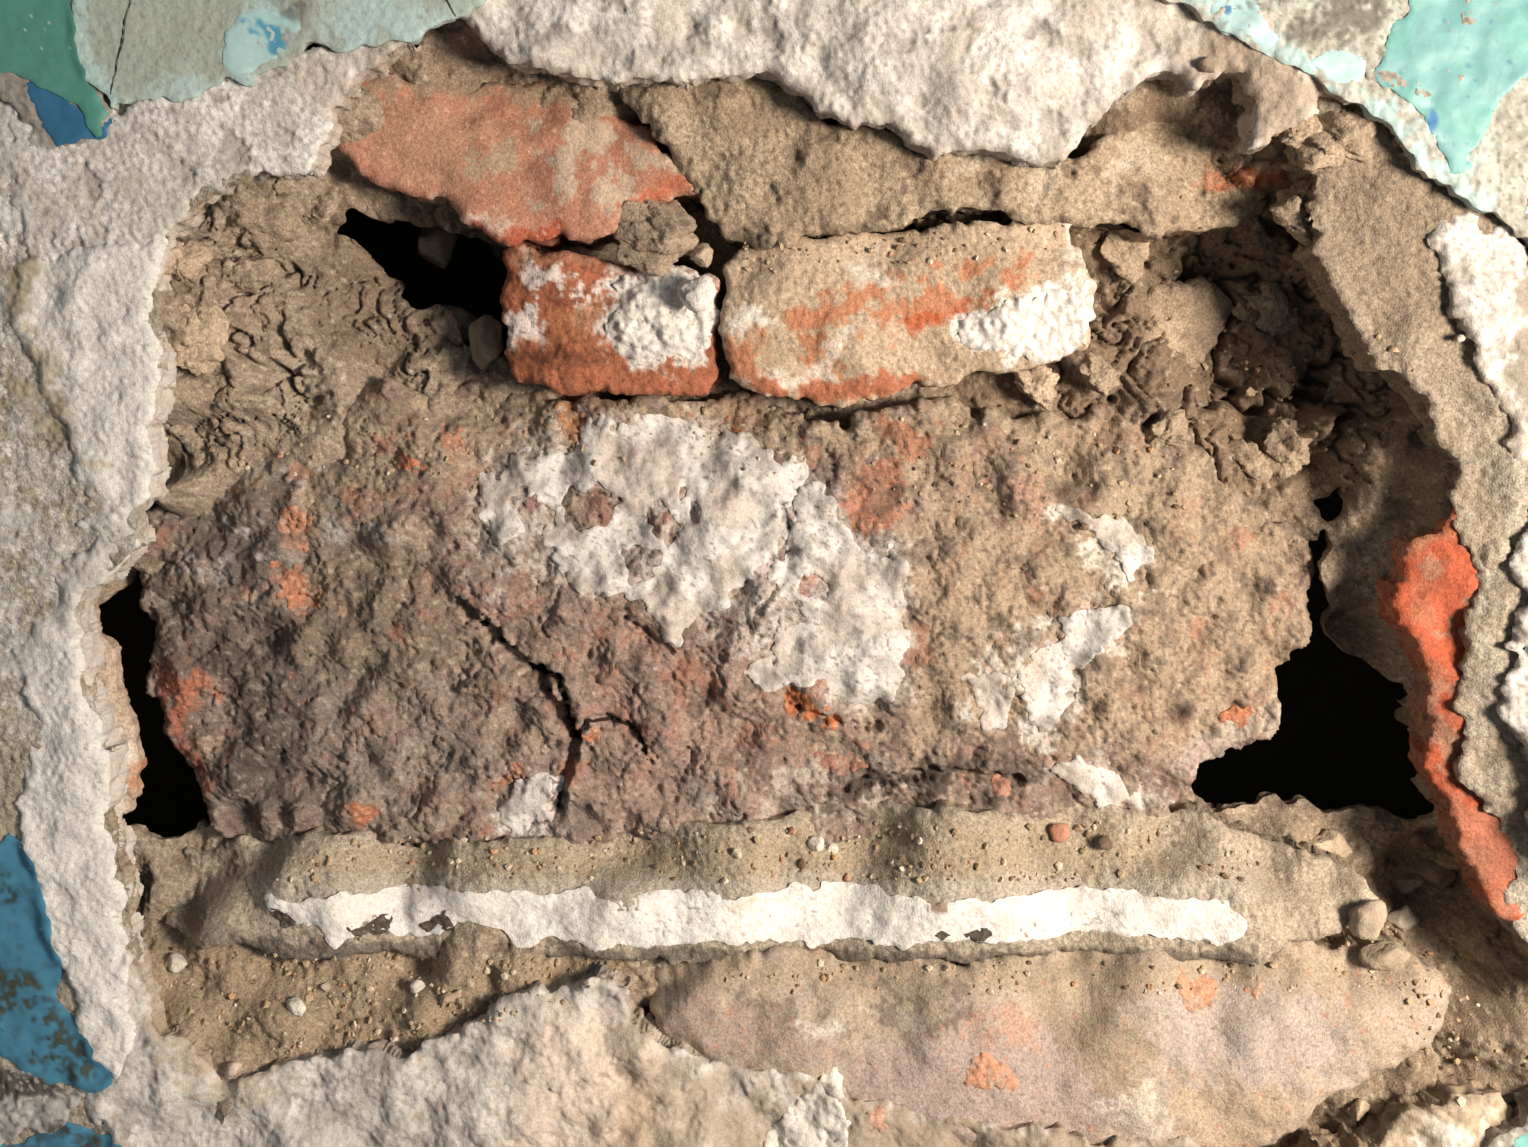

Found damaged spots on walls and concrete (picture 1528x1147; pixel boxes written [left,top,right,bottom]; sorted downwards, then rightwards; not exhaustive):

crack [110,0,132,94]
peeling [1311,0,1528,174]
spalling [0,0,1458,728]
flaking render [1427,206,1528,473]
crack [472,608,648,760]
crack [556,774,566,808]
flaking render [0,234,1201,1147]
flaking render [1477,528,1528,762]
spalling [1175,773,1528,1147]